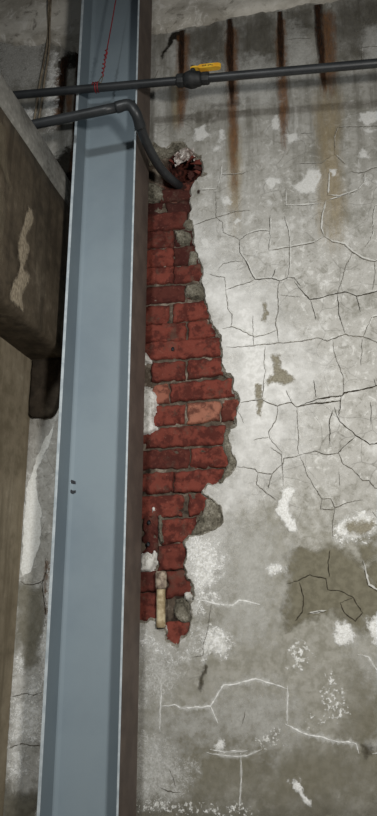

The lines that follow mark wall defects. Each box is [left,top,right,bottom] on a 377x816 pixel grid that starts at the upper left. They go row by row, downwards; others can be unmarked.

rust [178,30,188,73]
rust [226,19,237,164]
rust [277,11,287,129]
rust [314,4,334,85]
spalling [140,125,240,648]
crack [193,126,377,622]
damp [136,486,377,816]